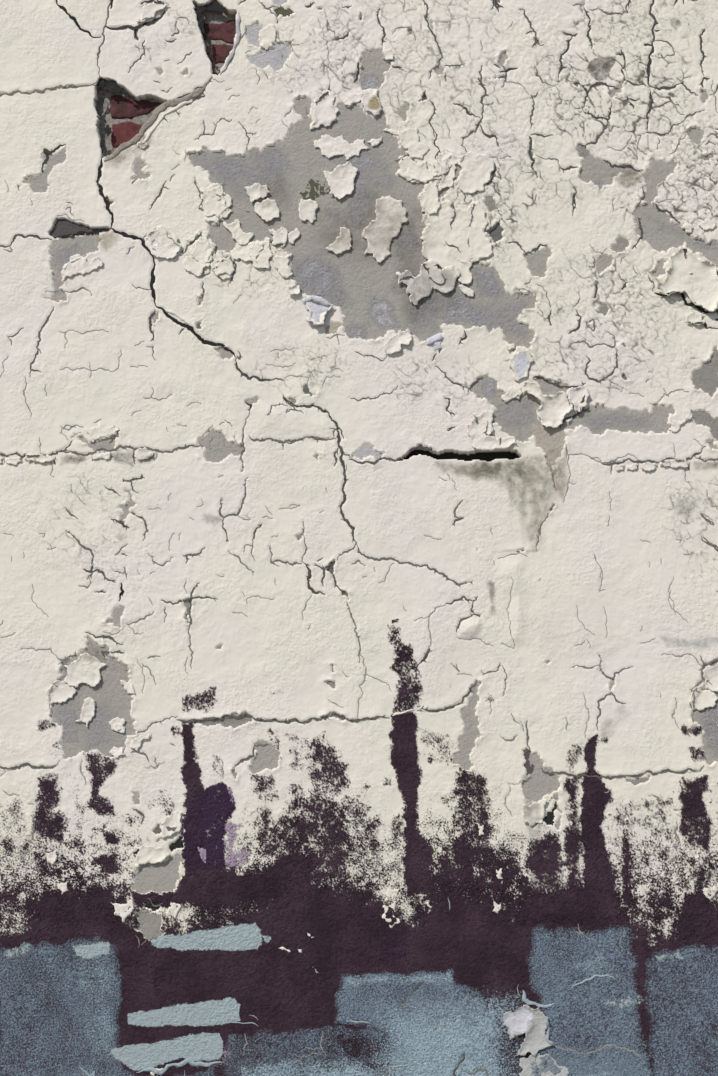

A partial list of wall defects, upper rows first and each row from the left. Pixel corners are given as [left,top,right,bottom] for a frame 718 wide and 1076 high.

peeling [200,0,294,75]
flaking render [109,95,162,147]
peeling [146,49,675,475]
peeling [576,145,718,326]
peeling [691,347,718,397]
peeling [691,410,718,449]
peeling [46,632,151,759]
peeling [689,661,718,765]
crack [0,759,86,860]
crack [504,765,704,865]
peeling [505,1008,533,1038]
peeling [519,1053,570,1076]